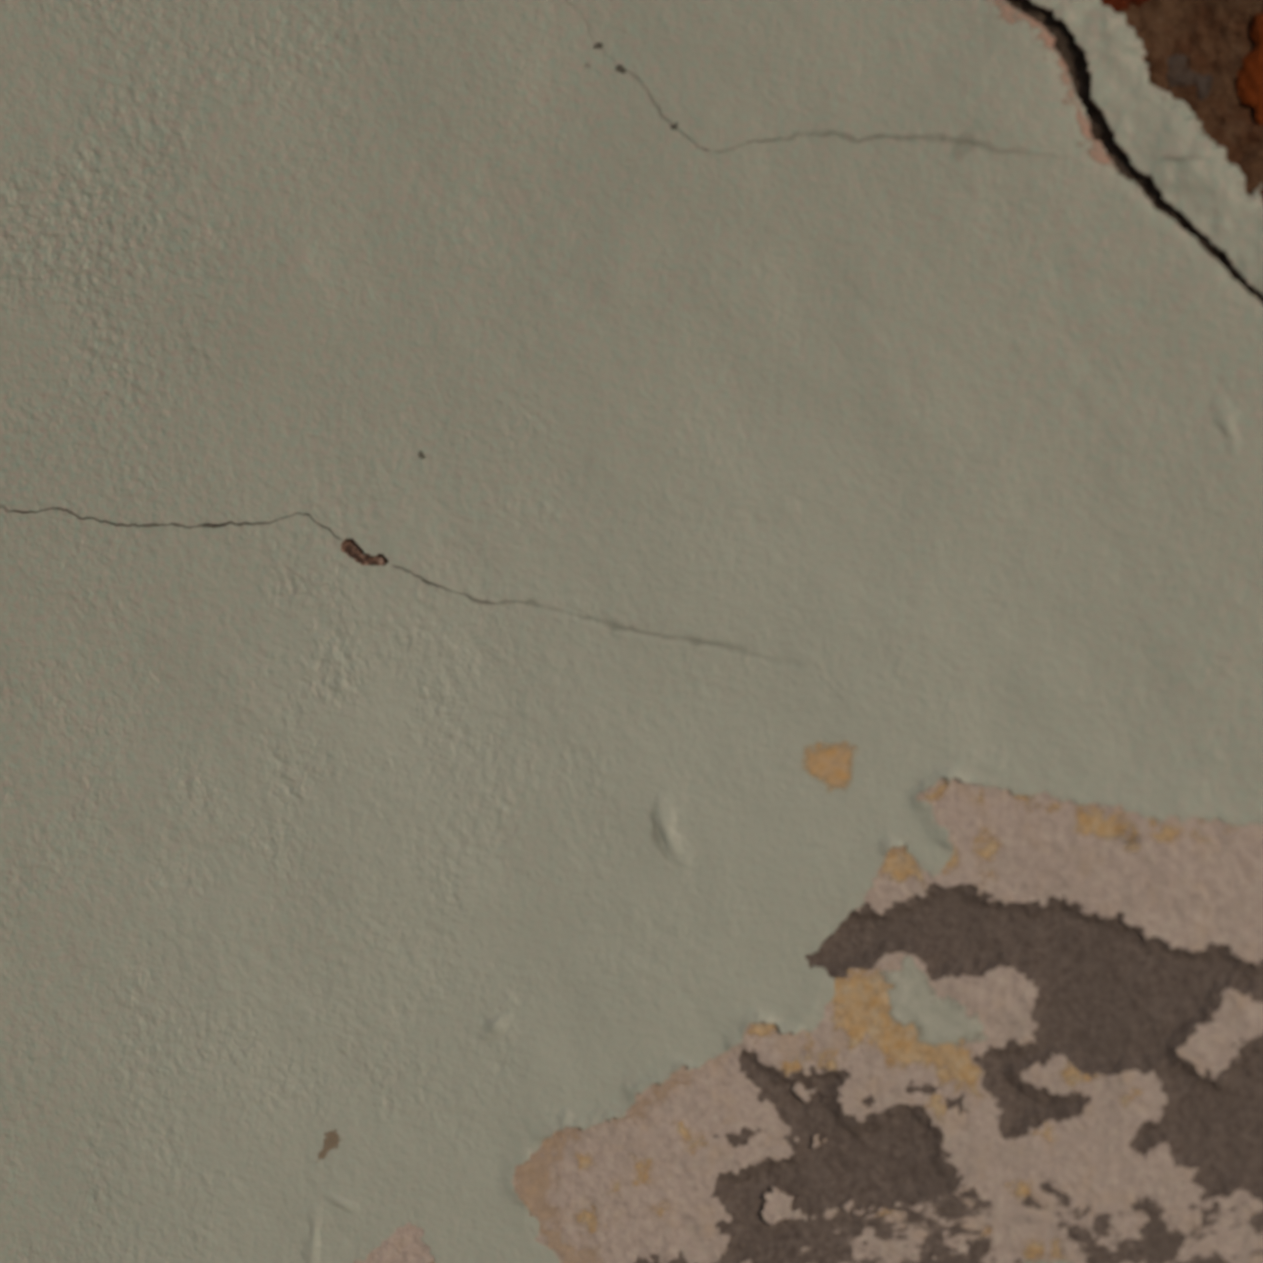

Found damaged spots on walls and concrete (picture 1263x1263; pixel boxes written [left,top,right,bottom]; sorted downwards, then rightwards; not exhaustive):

crack [616,65,626,73]
crack [995,0,1263,304]
spalling [1029,0,1263,294]
crack [205,520,231,528]
crack [342,539,389,566]
peeling [803,742,855,788]
peeling [512,778,1263,1263]
peeling [316,1132,338,1163]